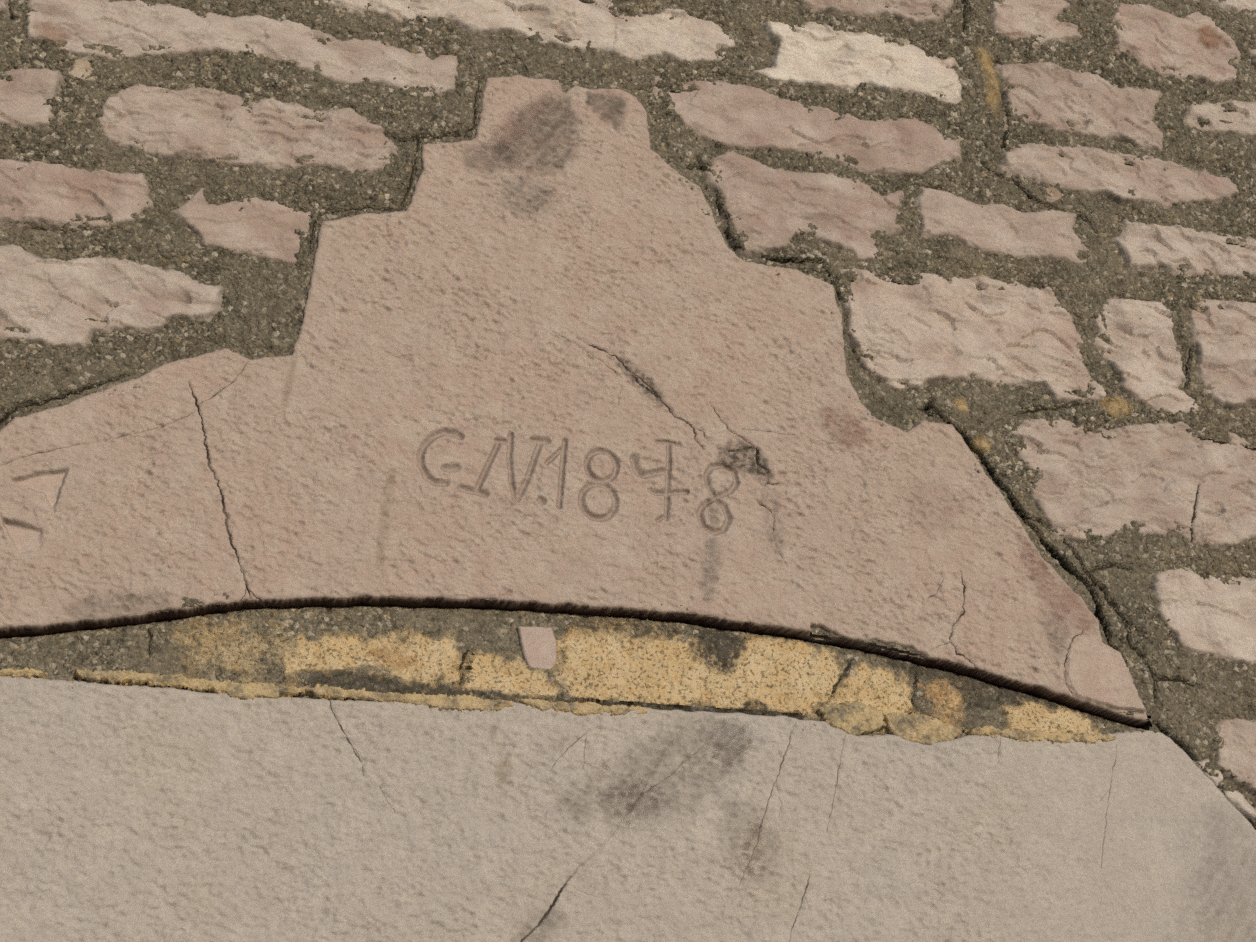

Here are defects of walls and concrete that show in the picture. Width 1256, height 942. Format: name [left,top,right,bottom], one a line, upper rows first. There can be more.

crack [564,337,782,532]
crack [188,381,266,608]
crack [923,403,1196,757]
peeling [0,667,48,679]
peeling [74,669,648,716]
peeling [816,702,1116,745]
spalling [1068,634,1145,709]